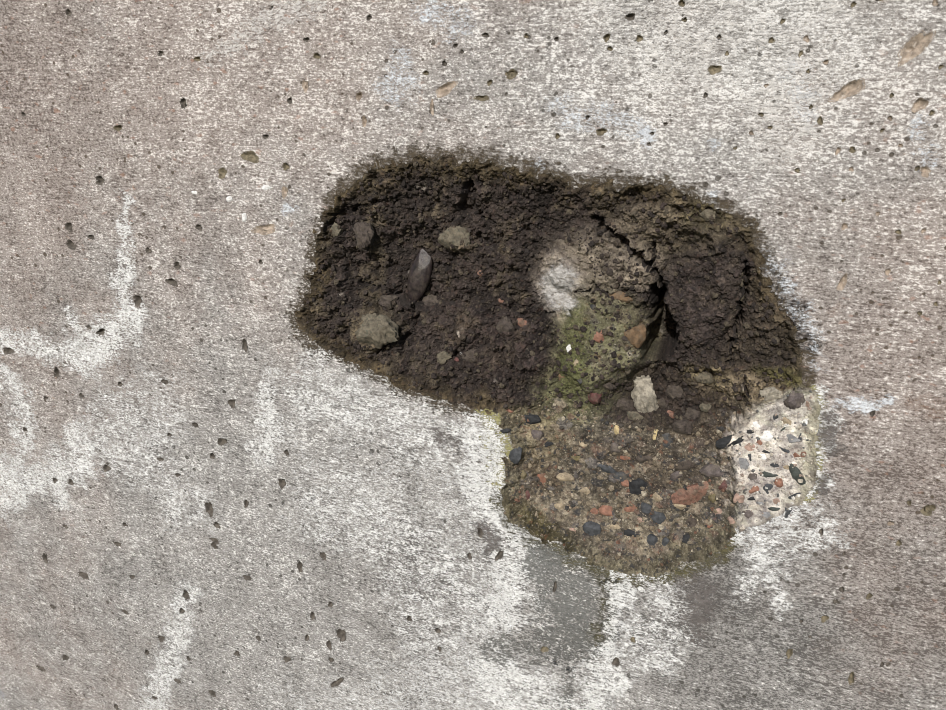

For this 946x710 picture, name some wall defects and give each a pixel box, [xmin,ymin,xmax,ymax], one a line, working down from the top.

spalling [294,154,823,577]